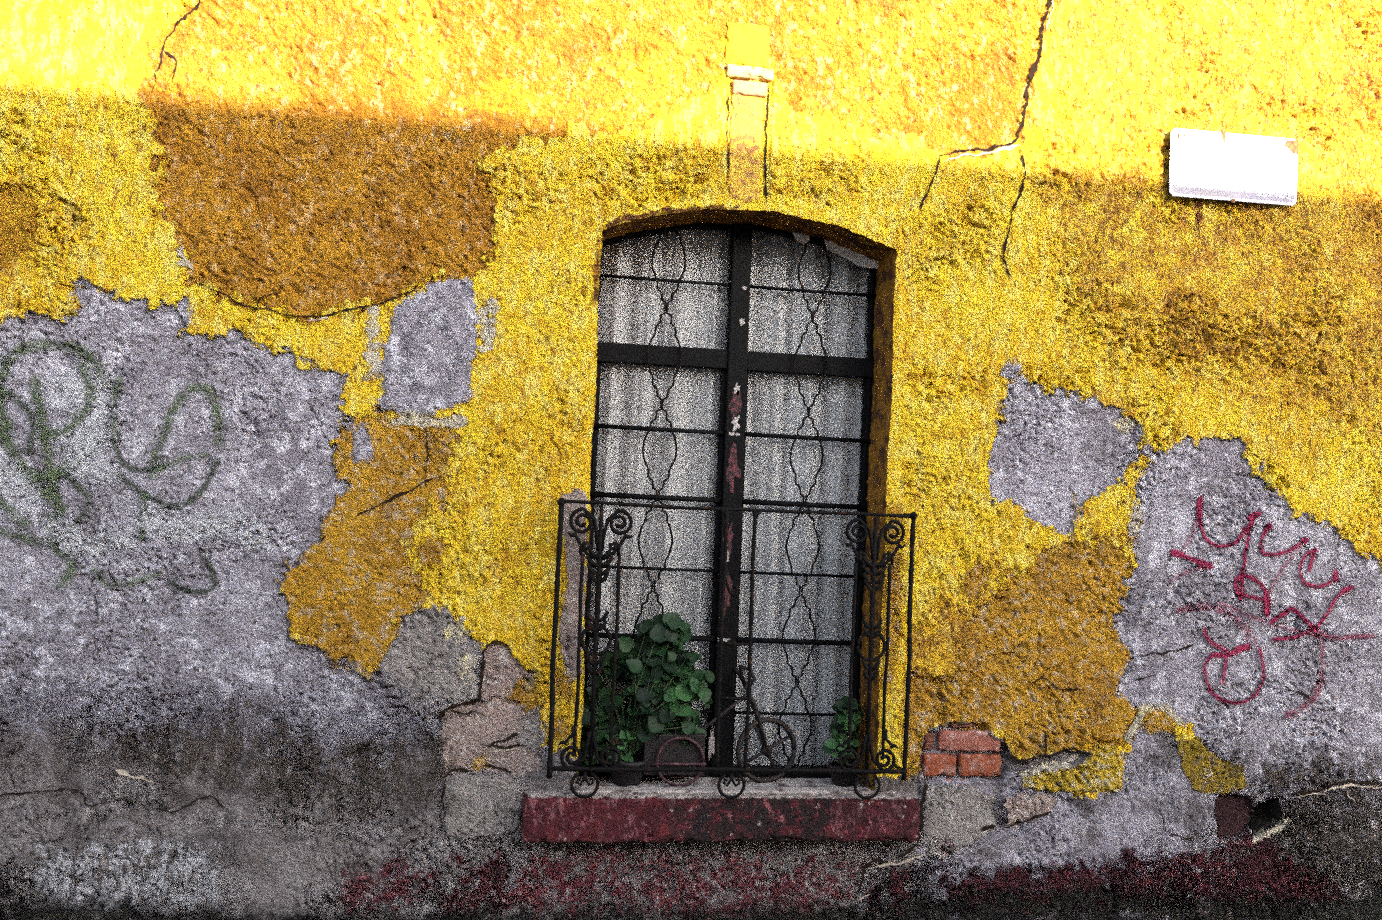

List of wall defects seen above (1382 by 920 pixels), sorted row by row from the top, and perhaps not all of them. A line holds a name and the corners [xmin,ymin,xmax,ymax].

crack [919,0,1054,286]
peeling [0,0,1059,776]
spalling [880,361,1382,803]
leakage [35,839,220,915]
leakage [0,704,453,821]
leakage [1214,744,1382,900]